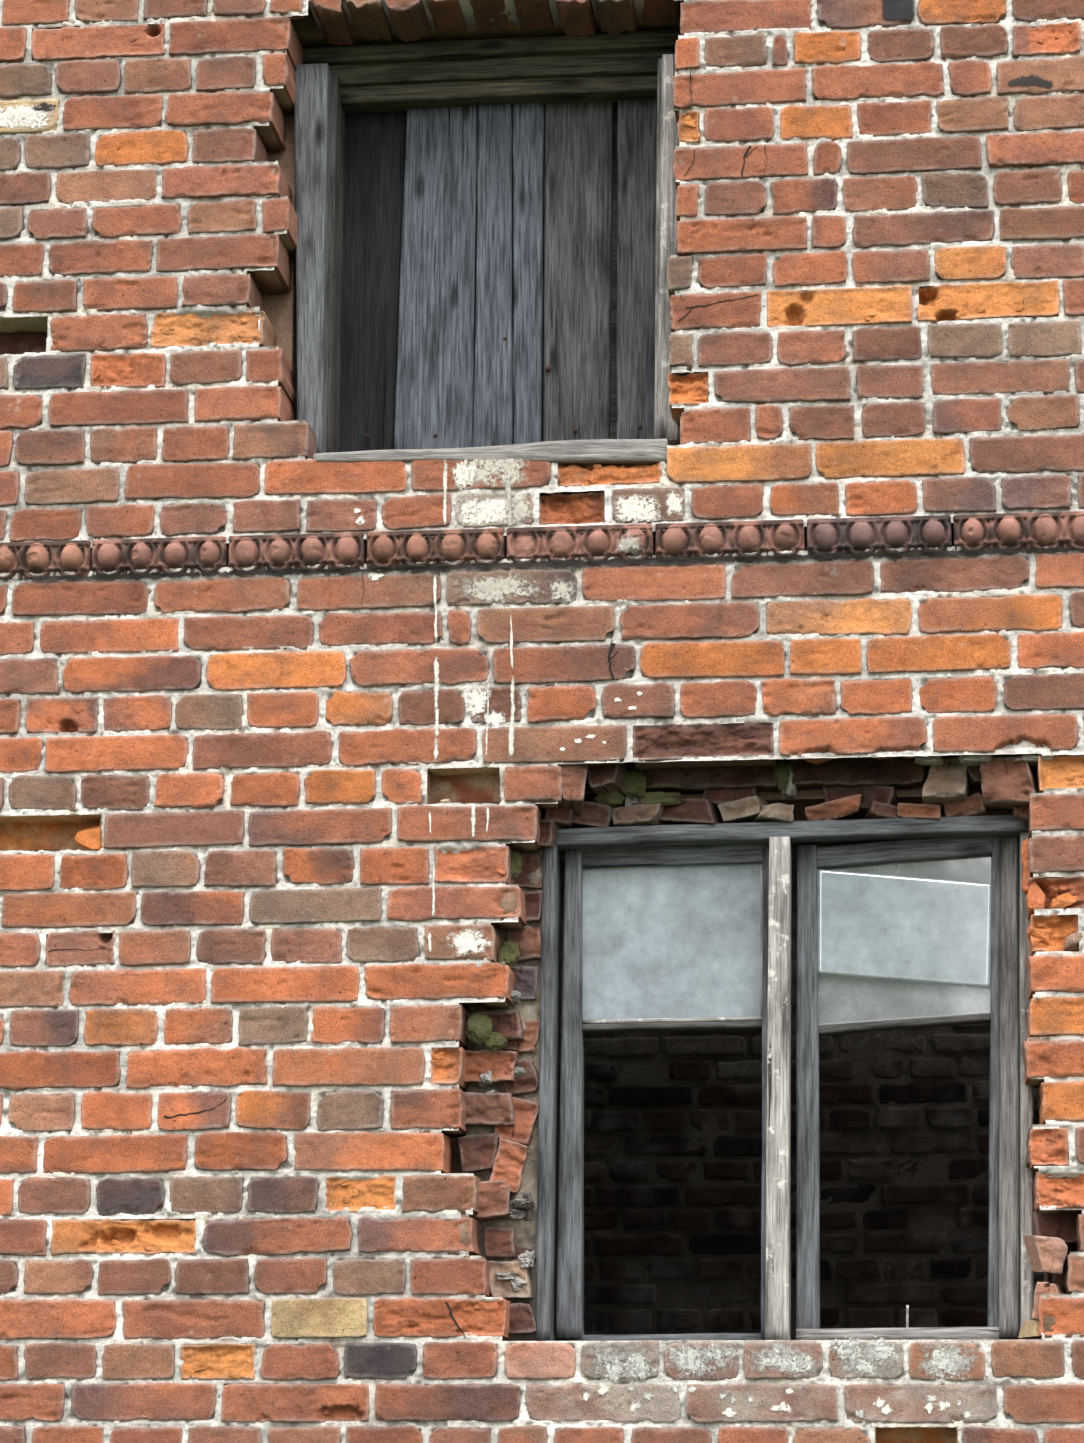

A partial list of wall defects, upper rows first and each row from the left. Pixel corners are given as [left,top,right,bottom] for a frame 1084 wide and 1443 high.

spalling [767,280,1060,327]
spalling [90,311,277,388]
water stain [443,459,532,525]
water stain [1,491,1084,755]
spalling [373,721,1084,1341]
spalling [325,1175,396,1212]
spalling [0,1218,197,1256]
spalling [180,1343,369,1422]